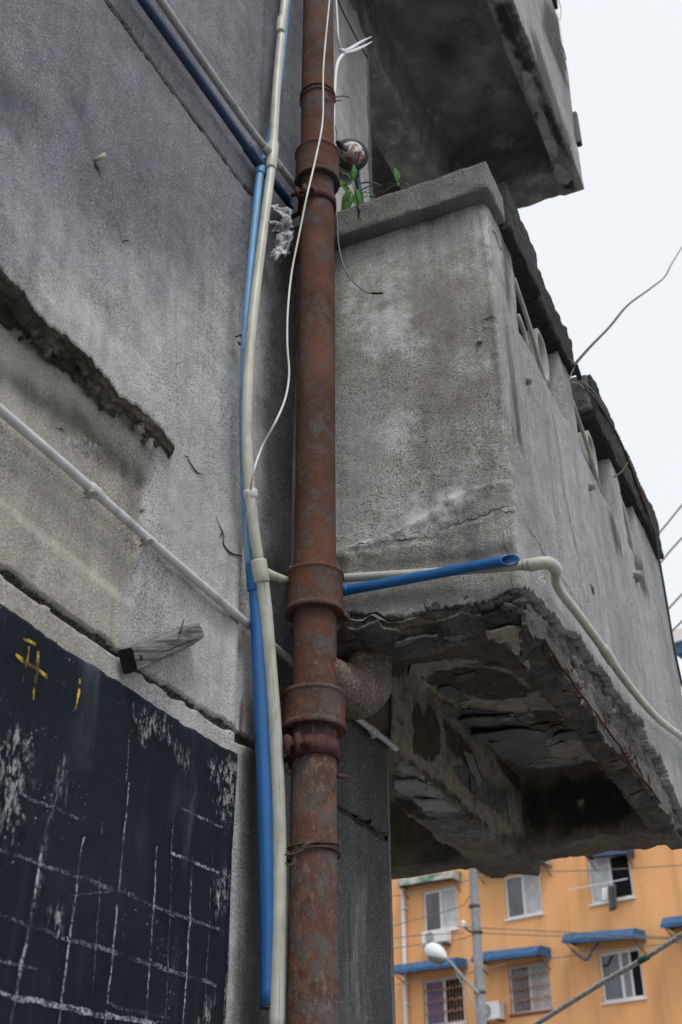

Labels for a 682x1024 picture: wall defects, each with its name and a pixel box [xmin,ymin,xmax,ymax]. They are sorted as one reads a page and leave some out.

water stain [494,1,574,166]
spalling [132,419,154,451]
crack [217,518,242,557]
crack [340,393,546,556]
spalling [337,572,682,842]
crack [338,806,388,836]